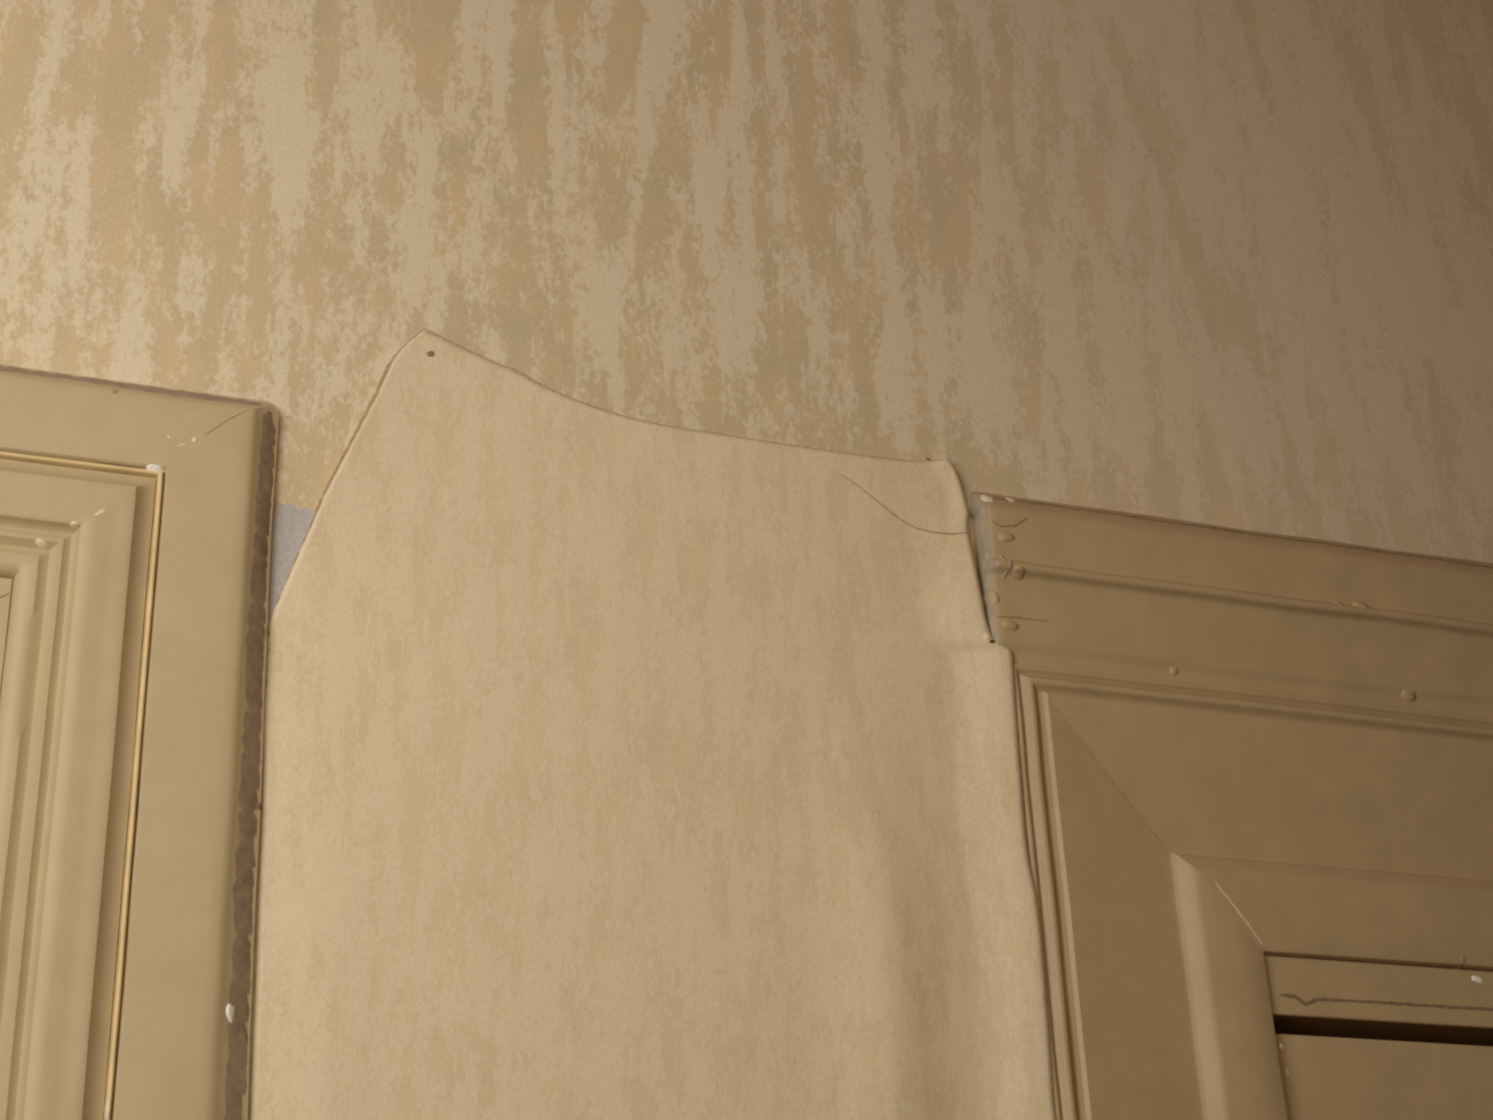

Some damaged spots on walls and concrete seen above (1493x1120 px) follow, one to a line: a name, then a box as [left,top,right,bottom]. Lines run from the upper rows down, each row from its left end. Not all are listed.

flaking render [268,499,315,625]